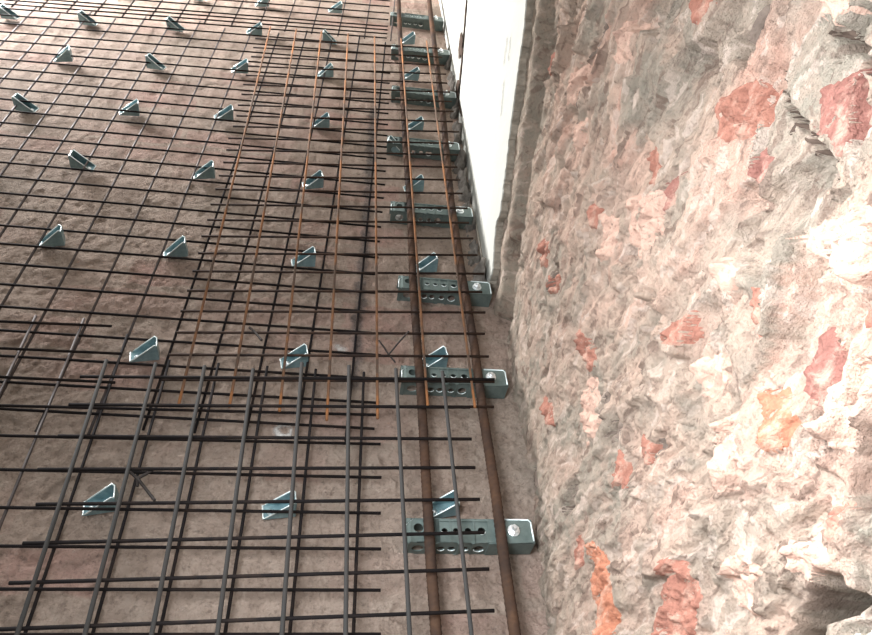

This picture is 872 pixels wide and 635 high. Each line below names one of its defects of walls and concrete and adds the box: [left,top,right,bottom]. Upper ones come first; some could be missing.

spalling [444,0,872,635]